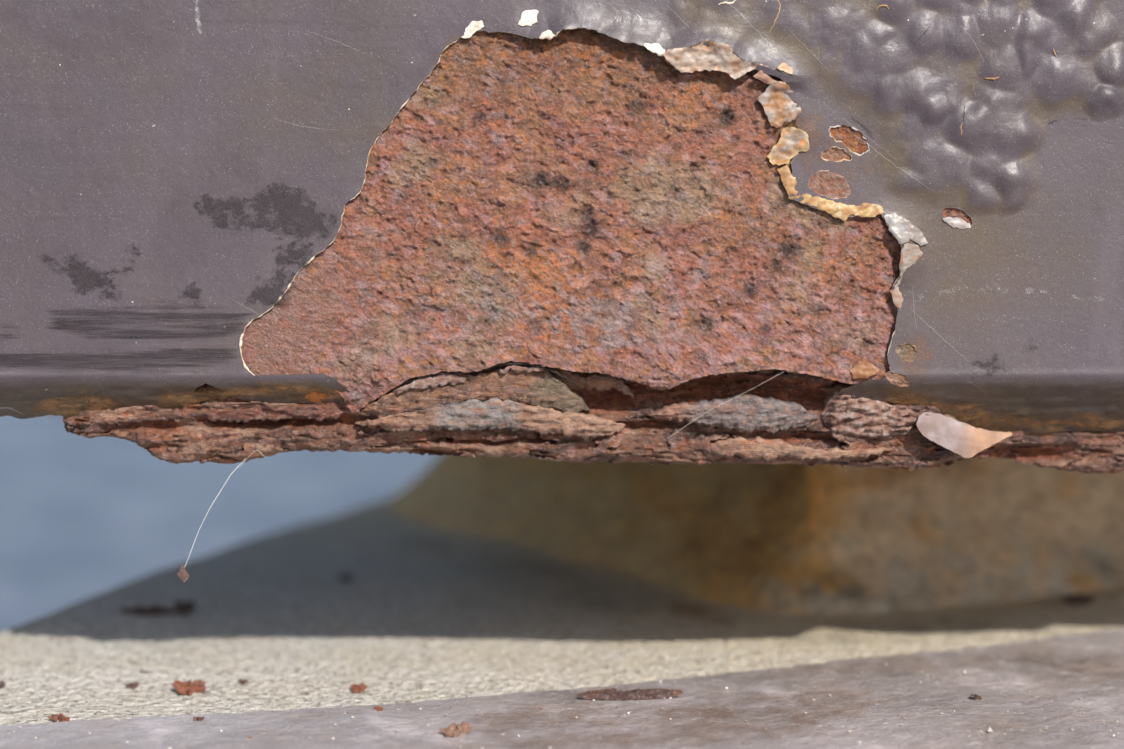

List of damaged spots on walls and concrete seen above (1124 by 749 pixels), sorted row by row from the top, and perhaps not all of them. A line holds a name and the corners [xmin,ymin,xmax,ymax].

spalling [808,125,870,199]
corrosion [159,10,1122,463]
damp [0,183,337,370]
spalling [885,343,917,387]
corrosion [34,391,121,416]
corrosion [1062,593,1096,605]